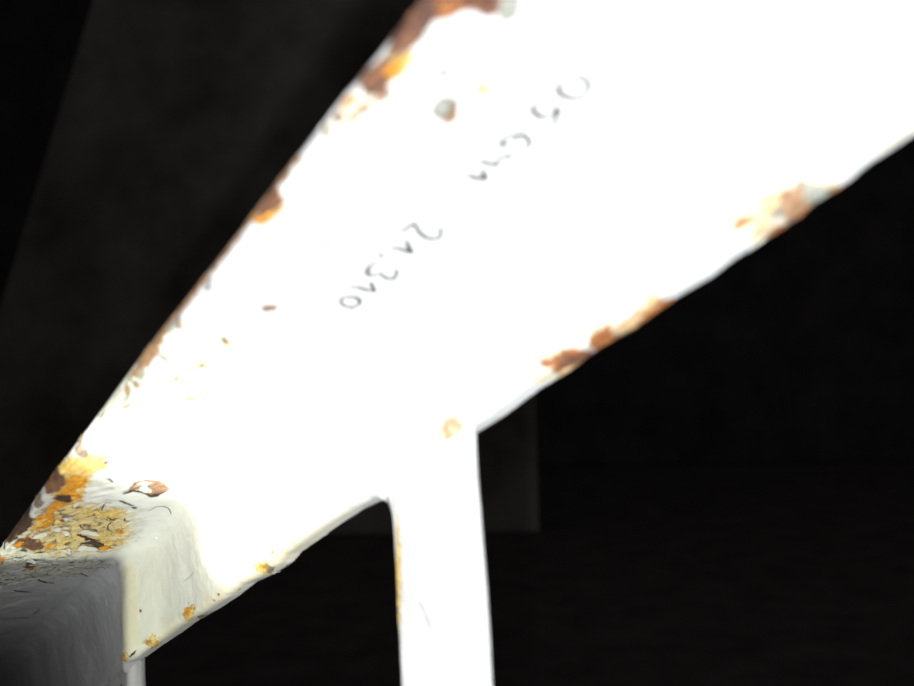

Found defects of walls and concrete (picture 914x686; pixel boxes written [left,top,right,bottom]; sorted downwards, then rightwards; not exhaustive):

rust [317,19,426,146]
rust [711,161,856,252]
rust [128,154,301,389]
rust [519,293,674,387]
rust [431,405,466,448]
peeling [123,479,170,497]
peeling [0,517,120,588]